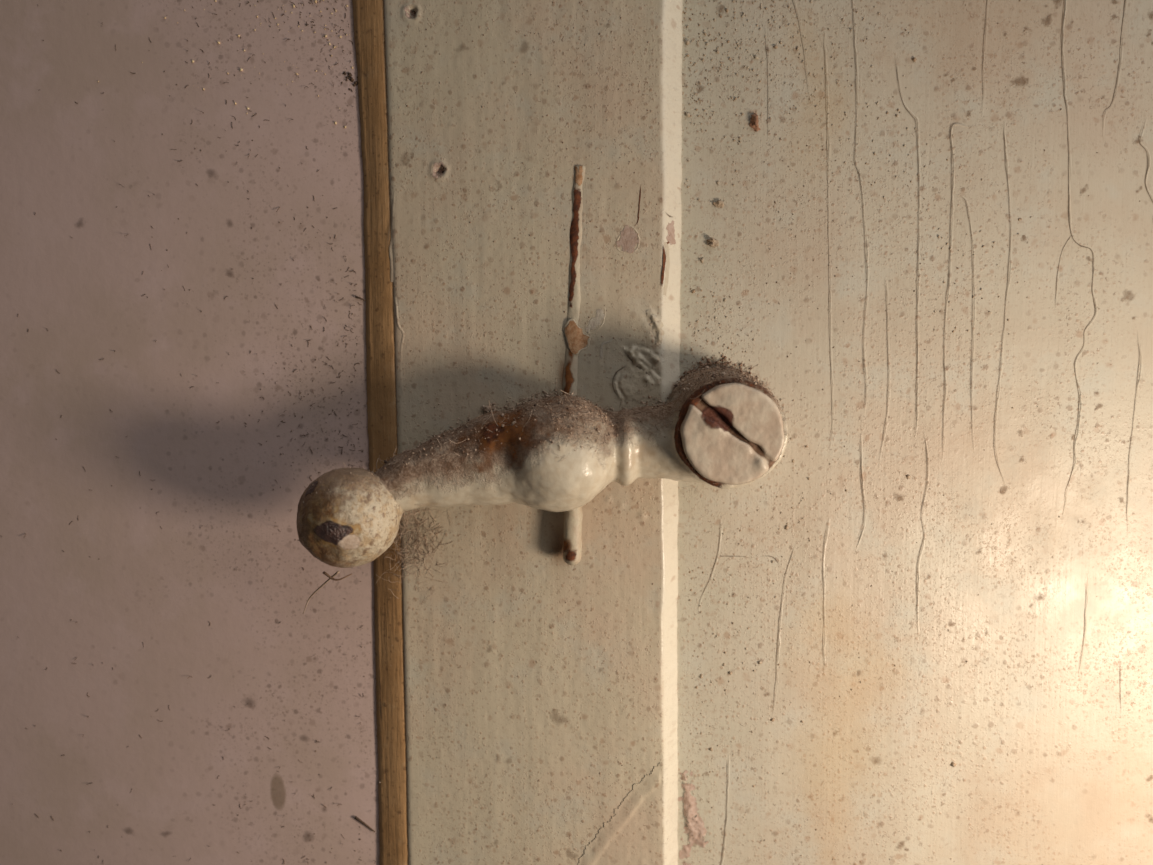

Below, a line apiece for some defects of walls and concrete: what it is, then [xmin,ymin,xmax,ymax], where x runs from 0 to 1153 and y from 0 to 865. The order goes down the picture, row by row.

crack [1102,0,1128,136]
crack [1139,118,1153,202]
corrosion [562,350,574,395]
corrosion [569,165,583,307]
crack [823,0,1013,632]
crack [1055,0,1098,515]
crack [1126,330,1143,536]
crack [697,516,742,615]
crack [772,518,831,723]
crack [1078,573,1089,675]